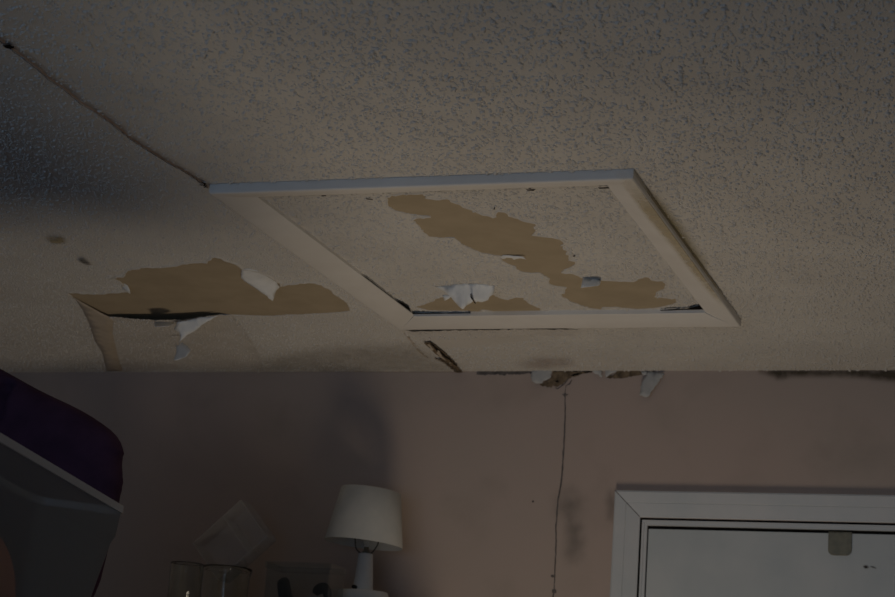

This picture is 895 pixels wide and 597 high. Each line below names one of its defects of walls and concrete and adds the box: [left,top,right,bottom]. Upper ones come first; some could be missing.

crack [0,38,208,188]
peeling [385,193,678,313]
peeling [66,256,352,371]
crack [404,329,584,373]
flaking render [477,370,665,397]
water stain [769,370,895,380]
crack [551,378,572,597]